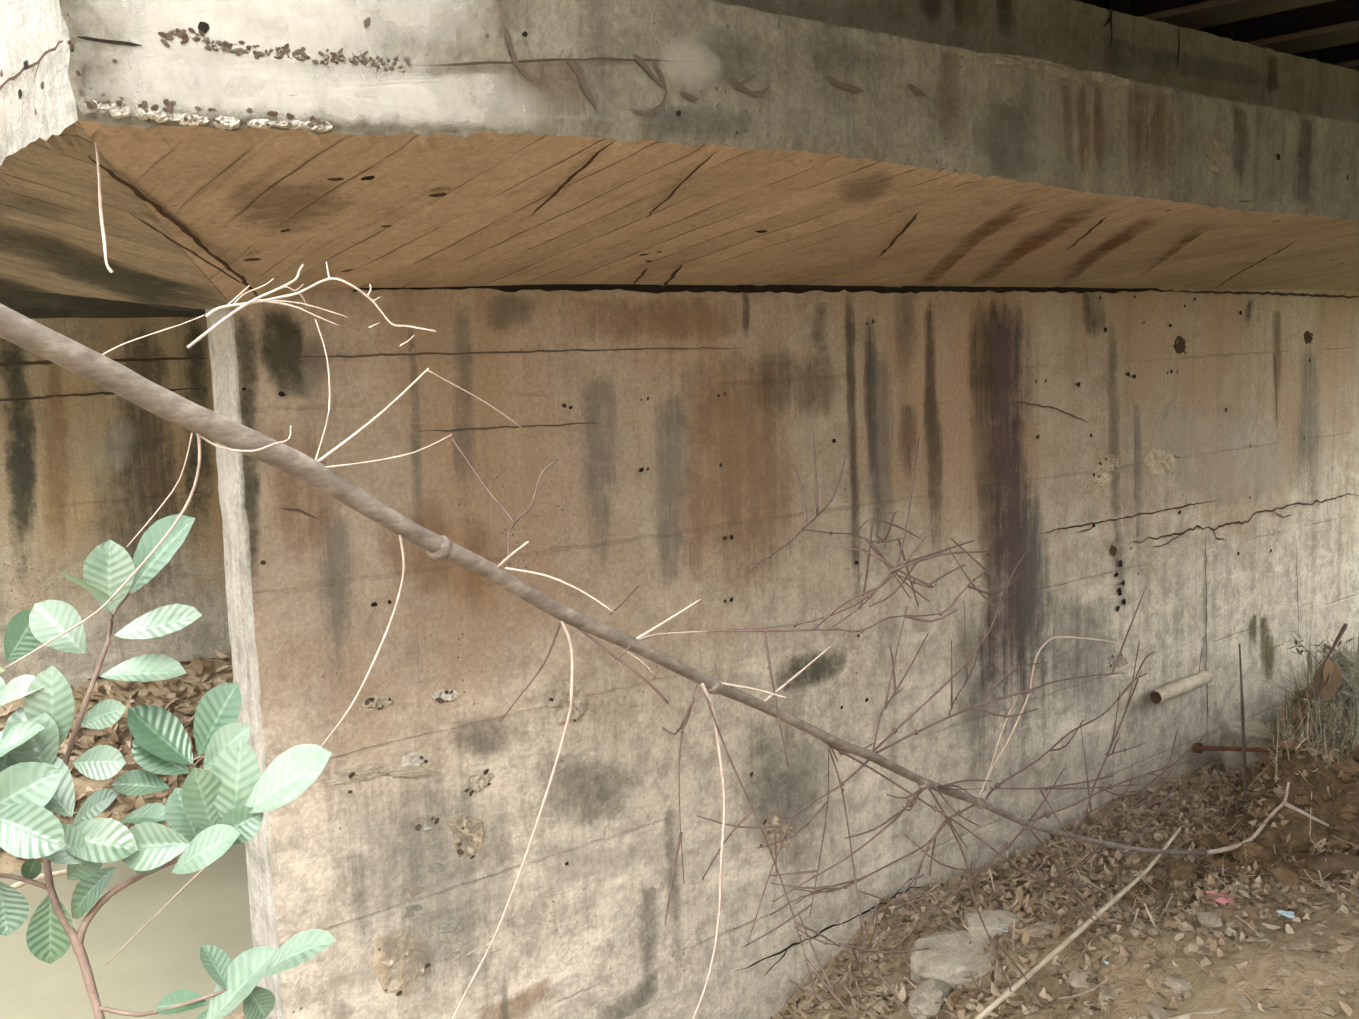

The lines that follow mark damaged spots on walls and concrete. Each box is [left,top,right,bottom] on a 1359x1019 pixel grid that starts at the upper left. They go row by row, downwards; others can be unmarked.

crack [0,36,142,90]
spalling [59,0,333,132]
peeling [157,27,411,72]
crack [529,141,616,217]
crack [353,211,1359,299]
leakage [1,344,36,530]
leakage [846,309,876,523]
leakage [926,312,940,495]
leakage [974,303,1043,712]
leakage [786,655,842,686]
crack [1041,493,1359,729]
crack [735,874,931,975]